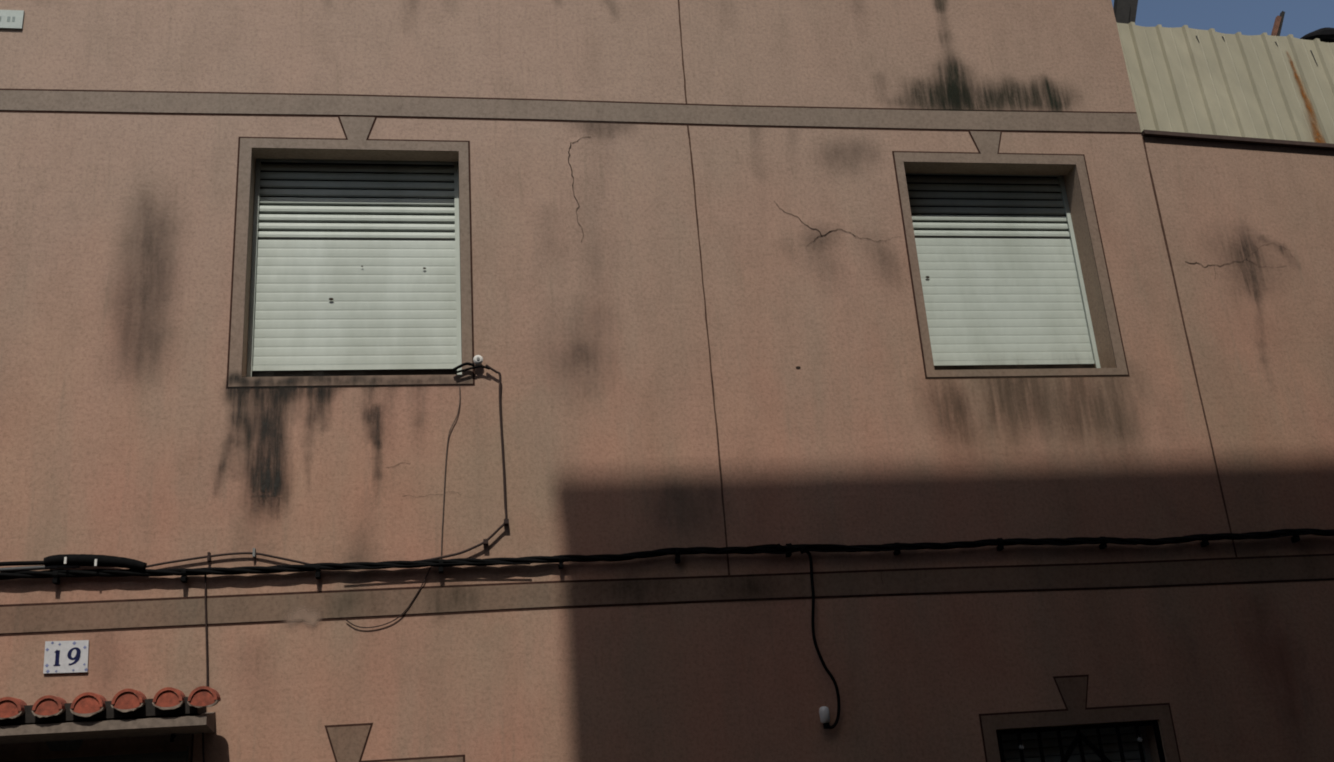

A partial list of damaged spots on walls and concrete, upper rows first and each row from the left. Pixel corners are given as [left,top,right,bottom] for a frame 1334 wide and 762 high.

damp [913,63,1068,112]
corrosion [1290,61,1325,143]
crack [568,137,584,242]
crack [774,201,897,242]
damp [229,375,330,509]
damp [367,407,380,449]